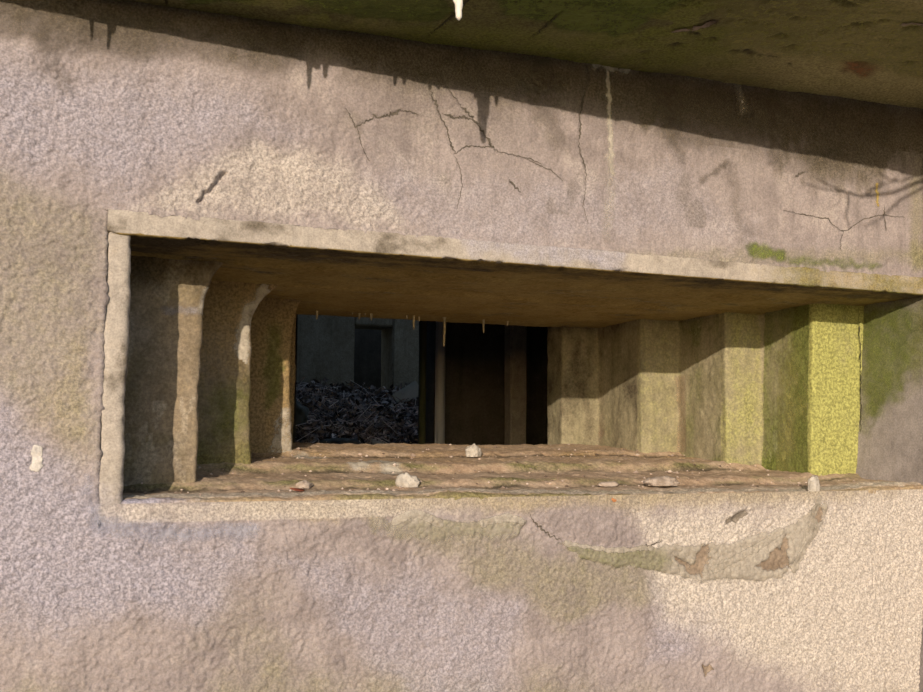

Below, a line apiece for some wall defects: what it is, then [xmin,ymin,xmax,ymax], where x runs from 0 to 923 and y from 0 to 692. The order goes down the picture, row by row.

crack [345,74,563,208]
crack [578,66,591,224]
damp [593,64,629,173]
crack [784,206,902,249]
flaking render [564,496,828,581]